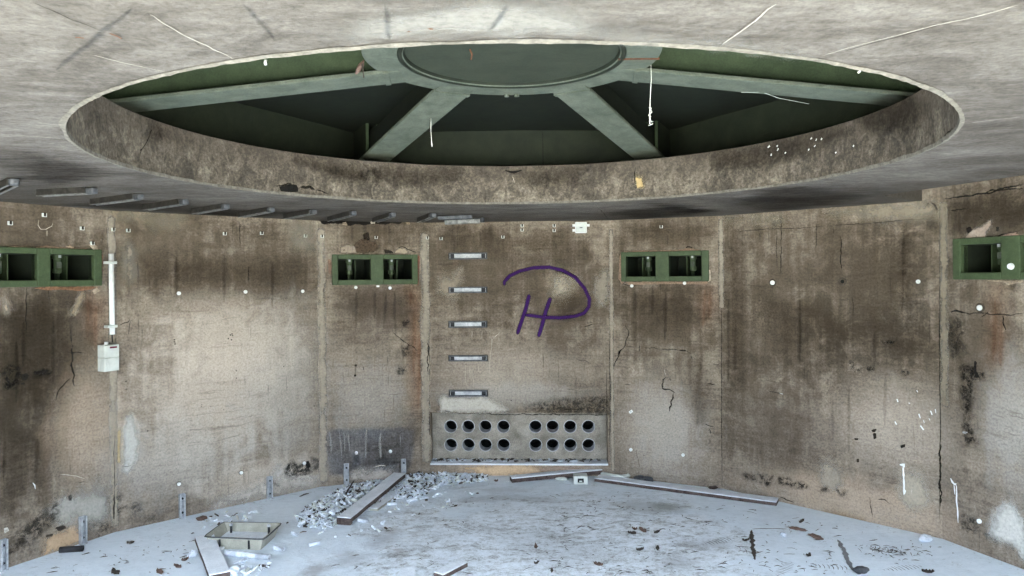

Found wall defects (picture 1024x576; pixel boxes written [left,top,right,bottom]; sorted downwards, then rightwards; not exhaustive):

spalling [278,183,328,194]
crack [56,329,81,399]
crack [394,308,722,453]
crack [738,185,1022,511]
damp [353,430,392,480]